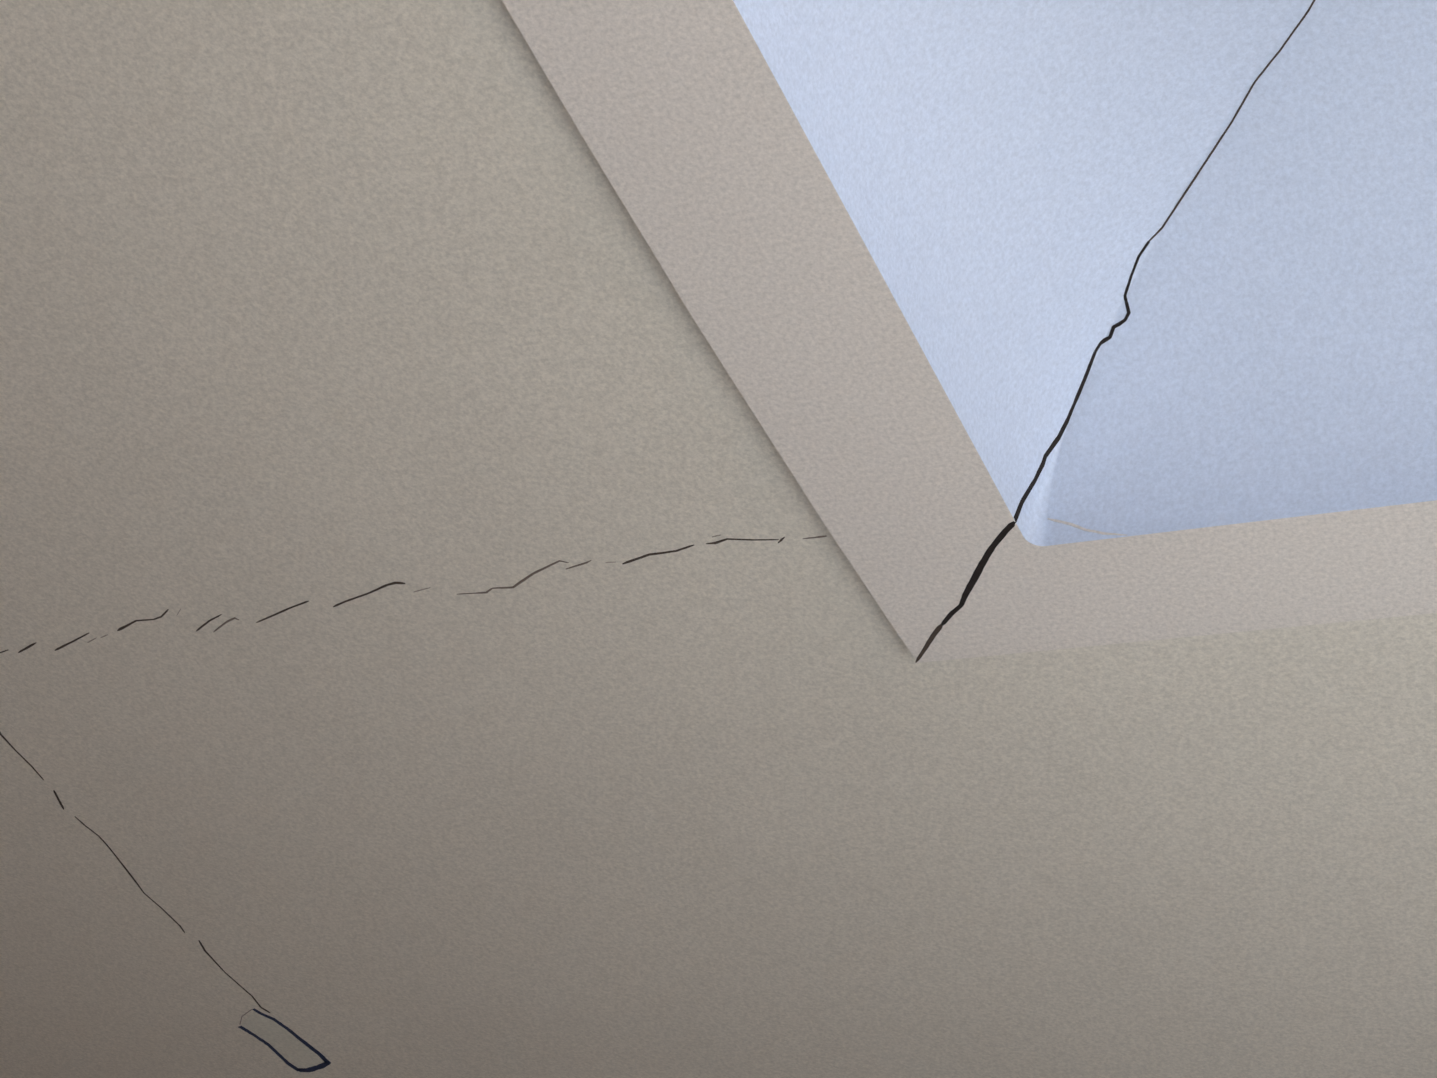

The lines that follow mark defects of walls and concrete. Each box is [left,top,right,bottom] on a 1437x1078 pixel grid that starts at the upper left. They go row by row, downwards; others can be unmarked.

crack [915,0,1315,663]
crack [0,535,827,653]
crack [0,732,270,1013]